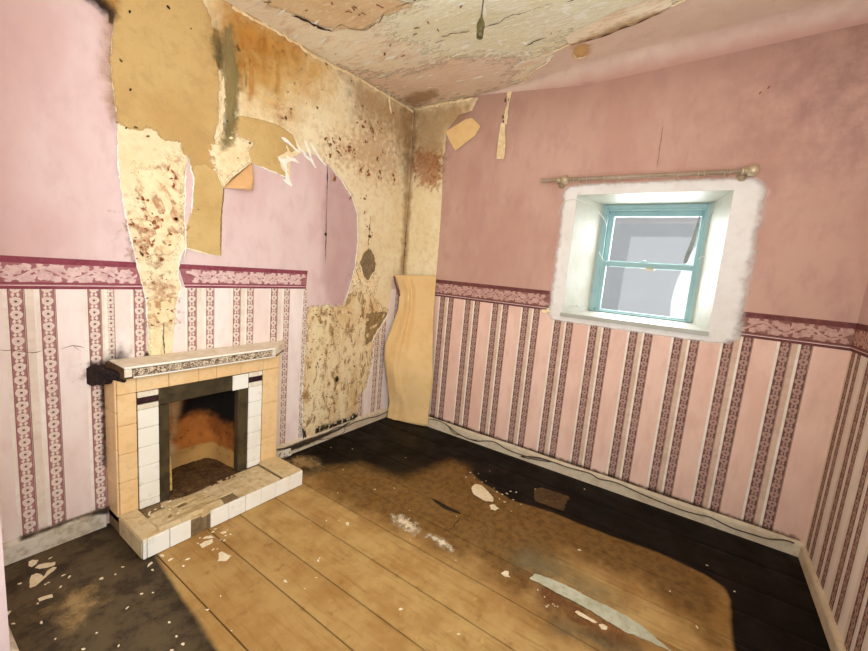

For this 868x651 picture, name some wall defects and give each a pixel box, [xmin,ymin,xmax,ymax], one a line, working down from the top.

water stain [213,11,322,147]
crack [294,0,416,32]
peeling [232,0,646,159]
spalling [351,211,380,293]